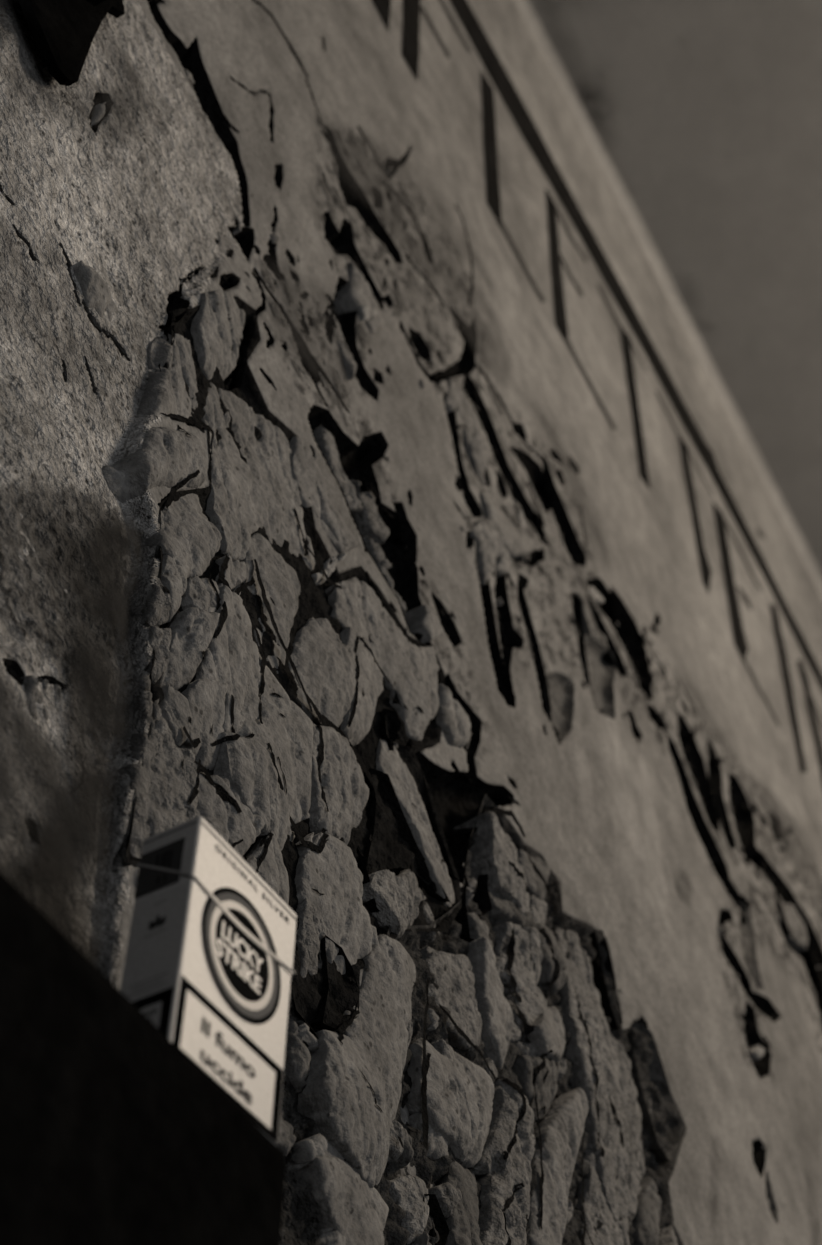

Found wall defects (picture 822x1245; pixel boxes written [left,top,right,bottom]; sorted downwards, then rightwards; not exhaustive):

spalling [89,92,114,132]
spalling [0,480,131,721]
peeling [112,112,822,1245]